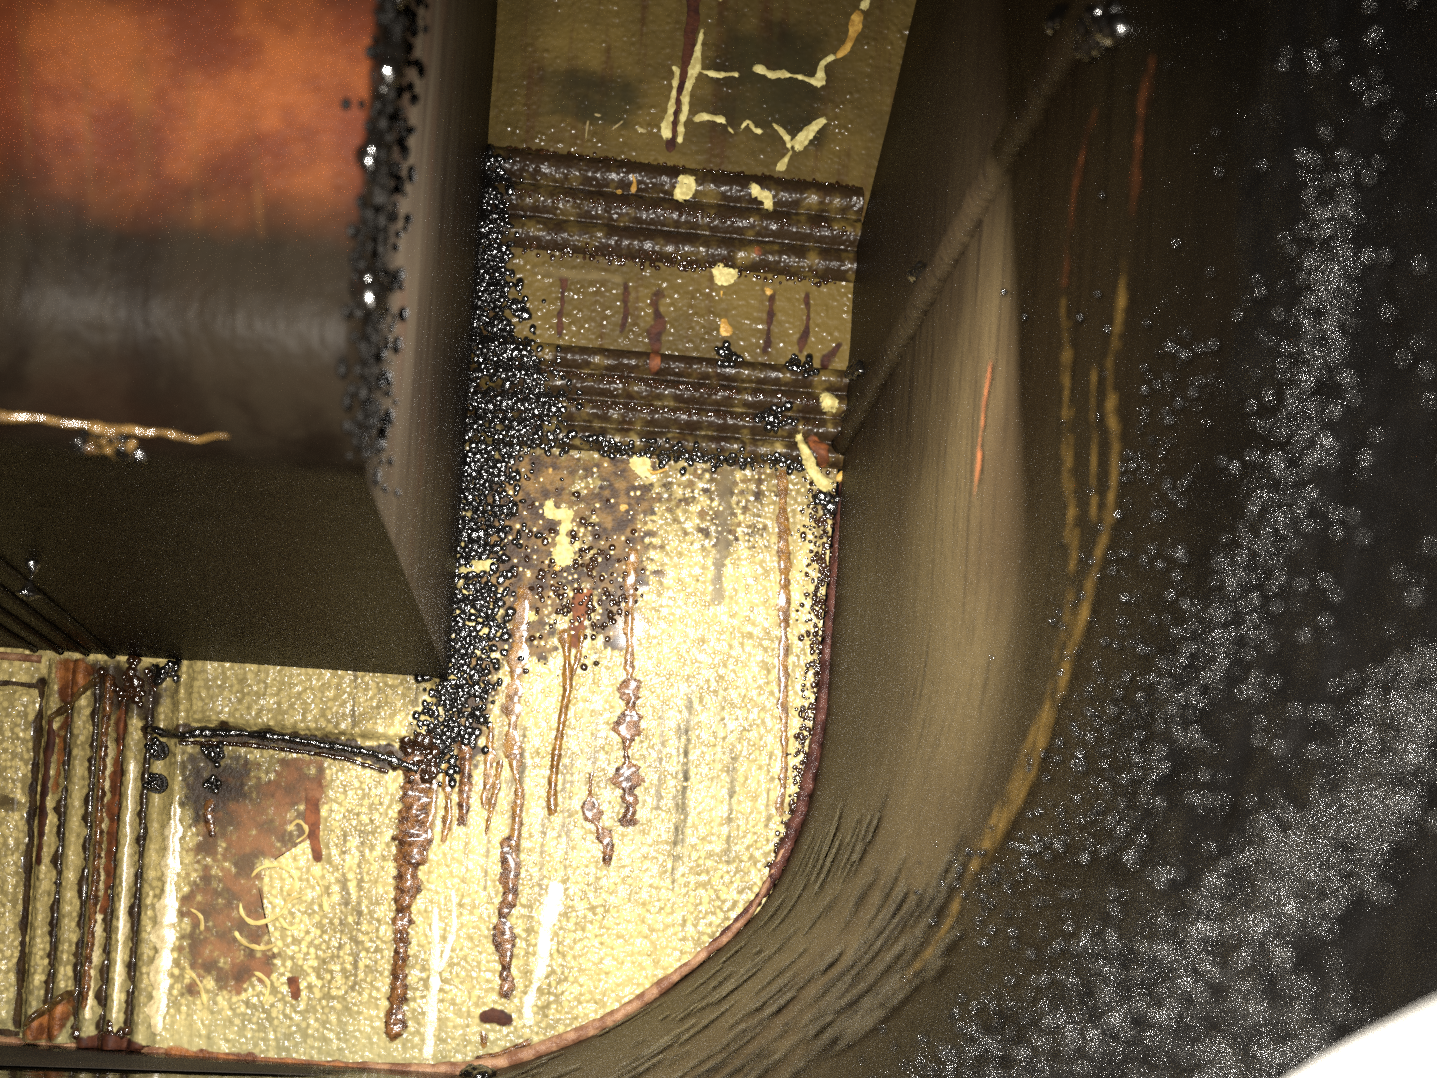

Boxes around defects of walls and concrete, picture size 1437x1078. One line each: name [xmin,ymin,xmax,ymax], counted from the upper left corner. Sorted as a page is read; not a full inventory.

corrosion [35,658,100,866]
corrosion [98,703,127,914]
corrosion [178,758,329,1004]